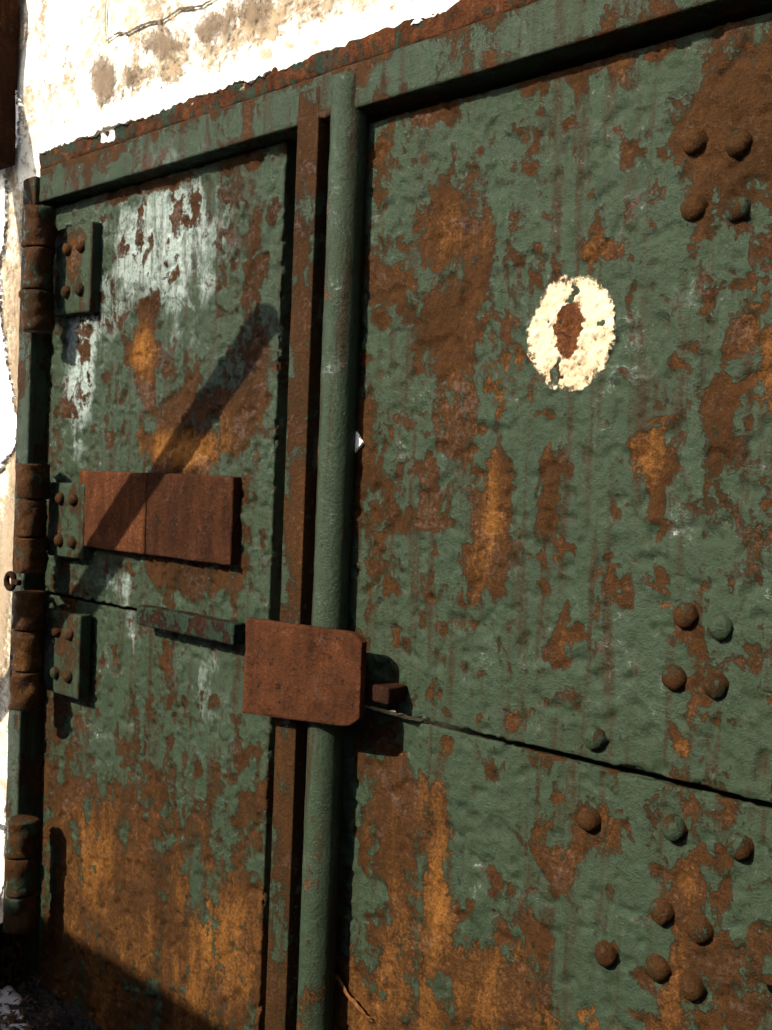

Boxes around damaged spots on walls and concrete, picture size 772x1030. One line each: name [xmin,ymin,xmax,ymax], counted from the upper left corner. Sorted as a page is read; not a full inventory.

peeling [15,86,24,157]
crack [105,0,212,41]
peeling [37,0,459,154]
damp [122,0,419,94]
peeling [0,168,17,471]